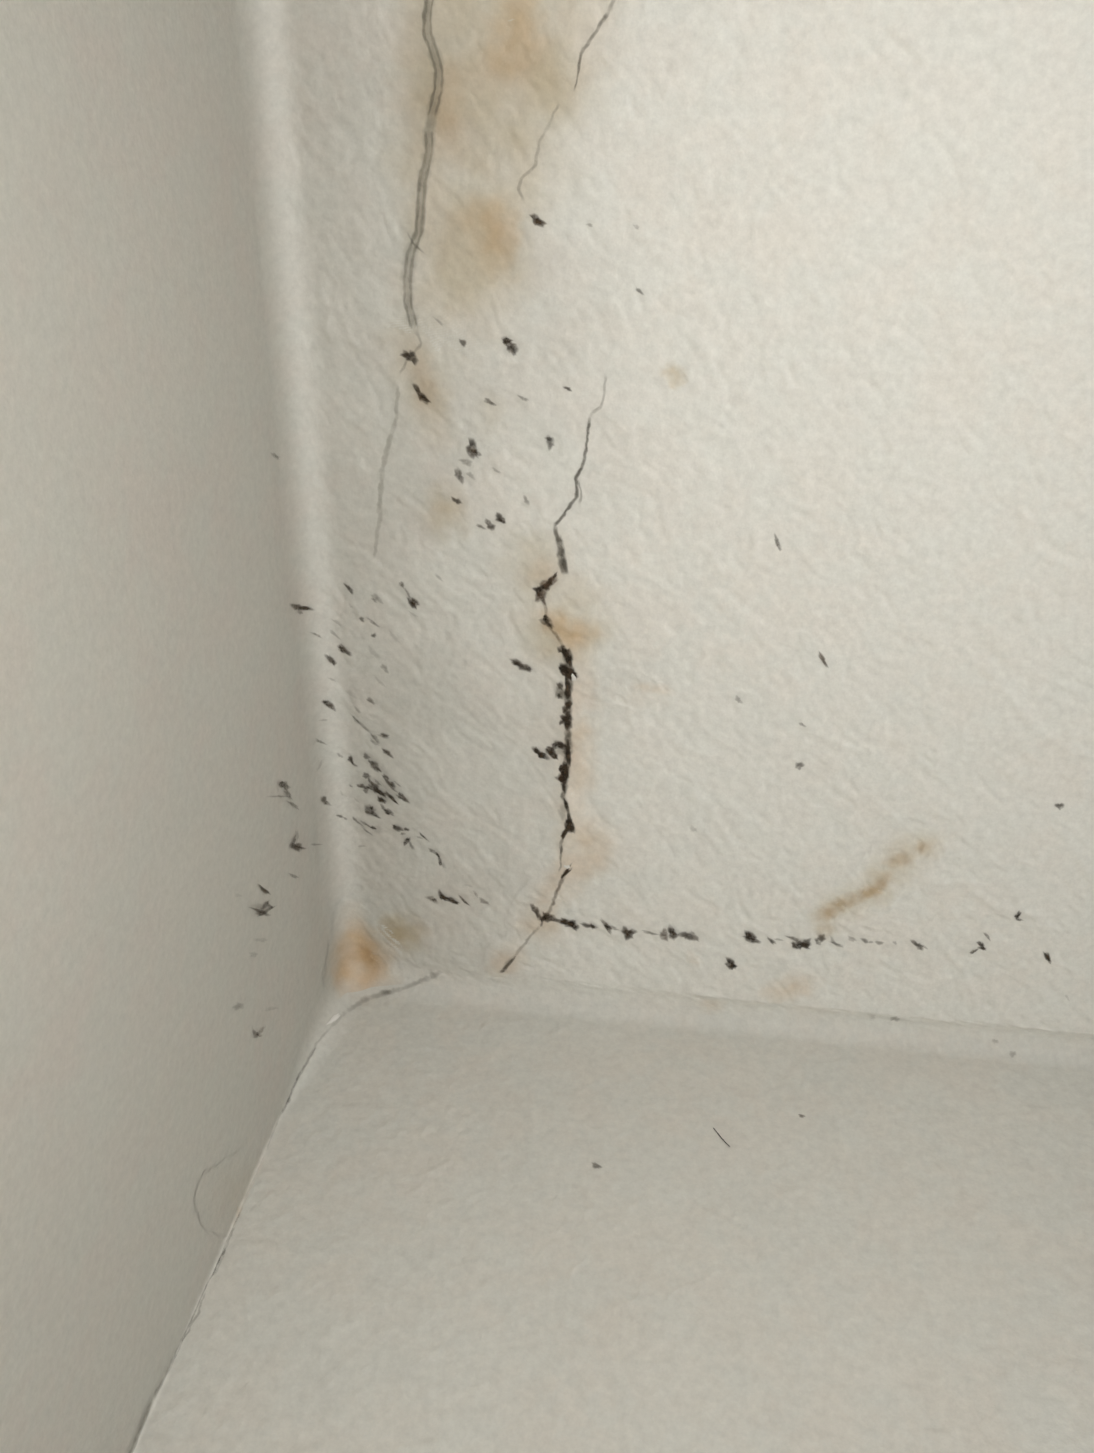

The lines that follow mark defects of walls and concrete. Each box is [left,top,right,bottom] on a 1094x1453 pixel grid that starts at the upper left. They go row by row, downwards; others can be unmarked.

leakage [348,751,441,864]
leakage [367,0,705,983]
crack [519,423,590,883]
leakage [744,819,957,1006]